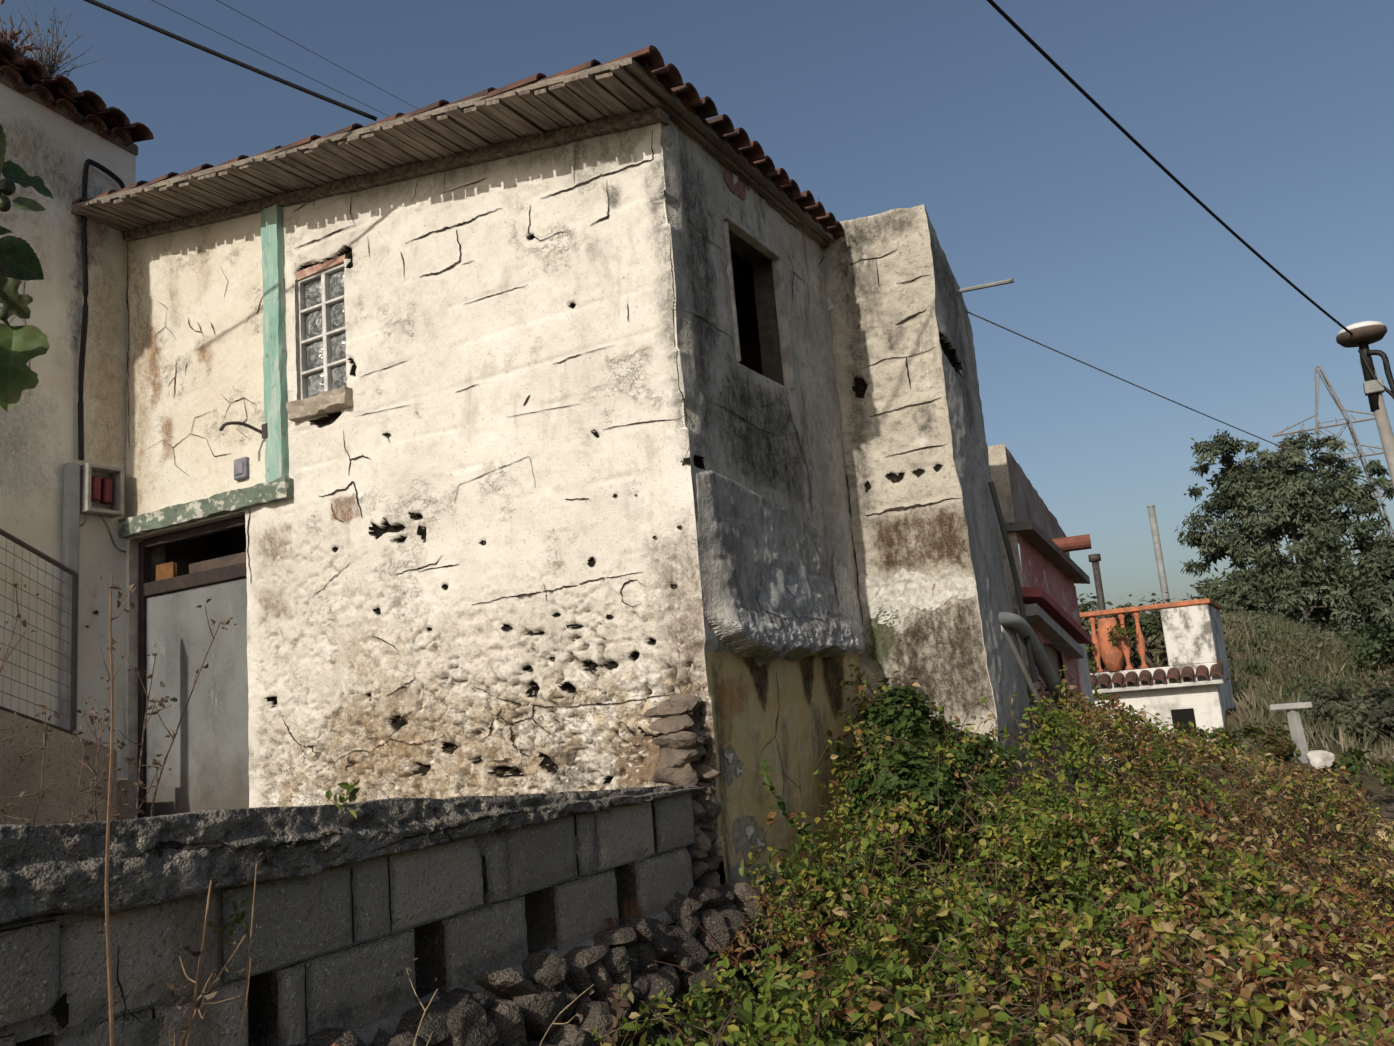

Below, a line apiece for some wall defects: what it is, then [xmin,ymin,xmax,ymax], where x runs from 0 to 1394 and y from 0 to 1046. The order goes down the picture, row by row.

crack [294,130,654,277]
crack [759,193,941,417]
crack [320,405,407,522]
water stain [875,509,966,569]
crack [472,572,645,607]
water stain [745,659,769,709]
water stain [889,600,994,714]
hole [387,715,408,731]
hole [411,762,431,776]
hole [441,742,524,779]
hole [538,752,559,774]
water stain [800,655,845,831]